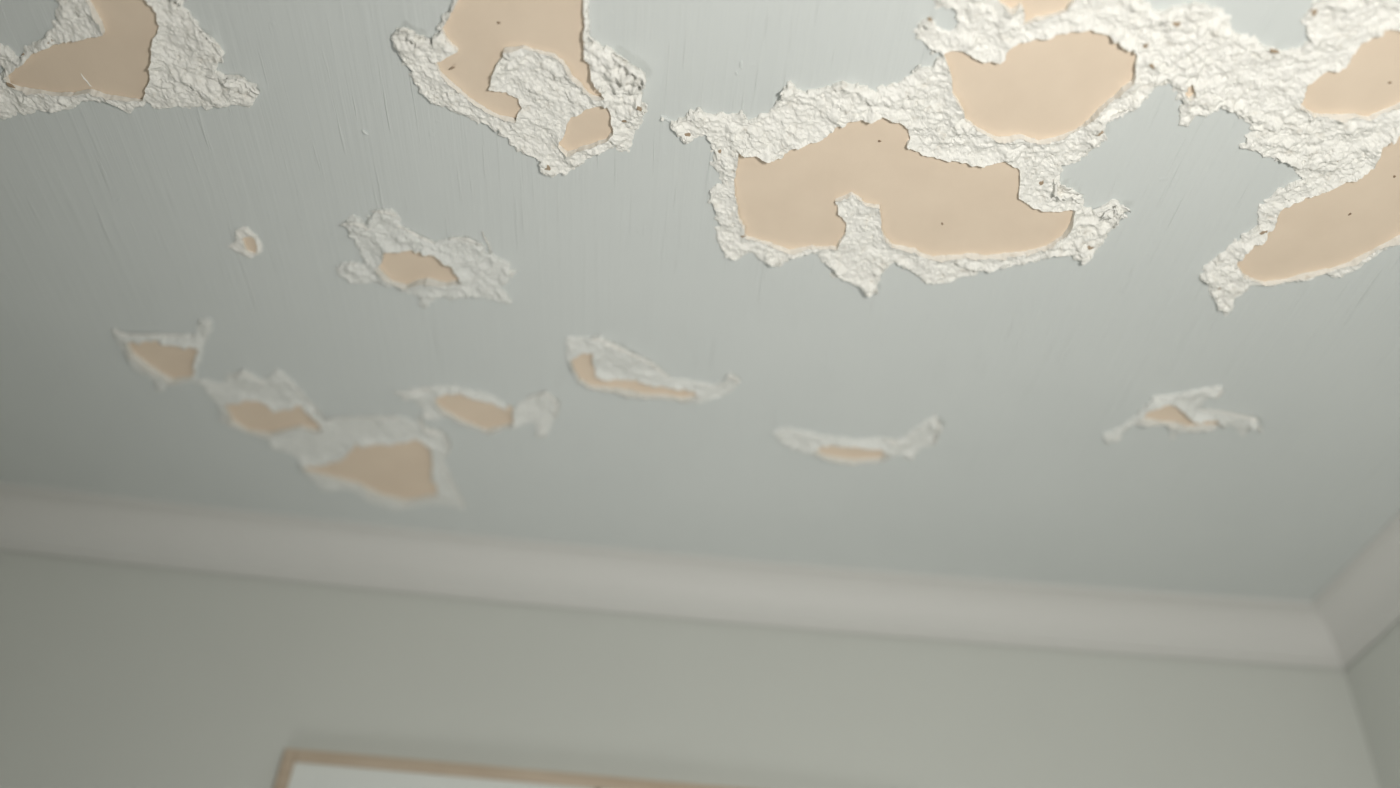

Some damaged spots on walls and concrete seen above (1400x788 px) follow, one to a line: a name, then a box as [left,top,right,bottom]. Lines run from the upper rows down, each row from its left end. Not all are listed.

peeling [0,0,260,120]
peeling [391,0,1400,317]
peeling [228,226,263,258]
peeling [336,208,517,308]
peeling [111,318,560,510]
peeling [565,336,741,404]
peeling [772,415,943,465]
peeling [1103,385,1263,444]